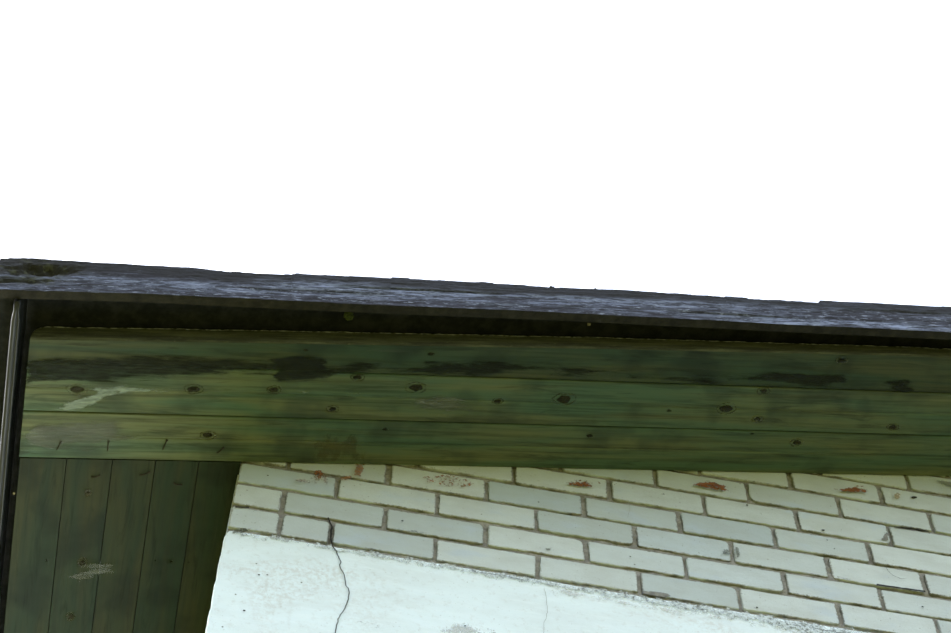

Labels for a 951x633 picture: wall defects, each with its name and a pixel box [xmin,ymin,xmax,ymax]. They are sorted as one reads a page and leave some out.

corrosion [693,481,726,491]
crack [328,517,350,633]
spalling [265,535,866,633]